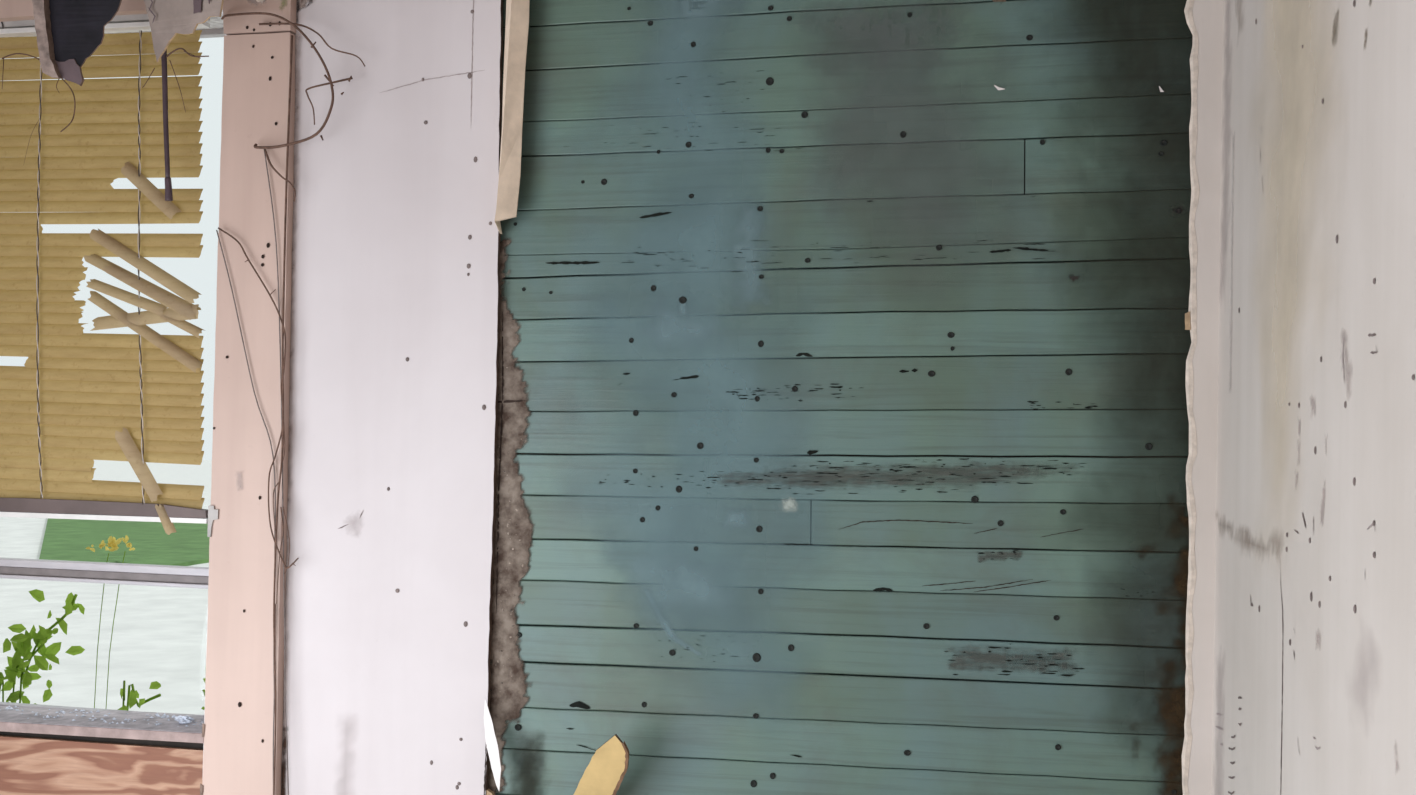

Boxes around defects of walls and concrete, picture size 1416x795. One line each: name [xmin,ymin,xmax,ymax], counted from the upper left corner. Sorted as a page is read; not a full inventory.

peeling [193,0,210,13]
peeling [495,0,530,234]
spalling [970,240,1048,259]
peeling [727,384,862,402]
peeling [676,450,1085,494]
peeling [944,644,1084,676]
peeling [484,699,501,790]